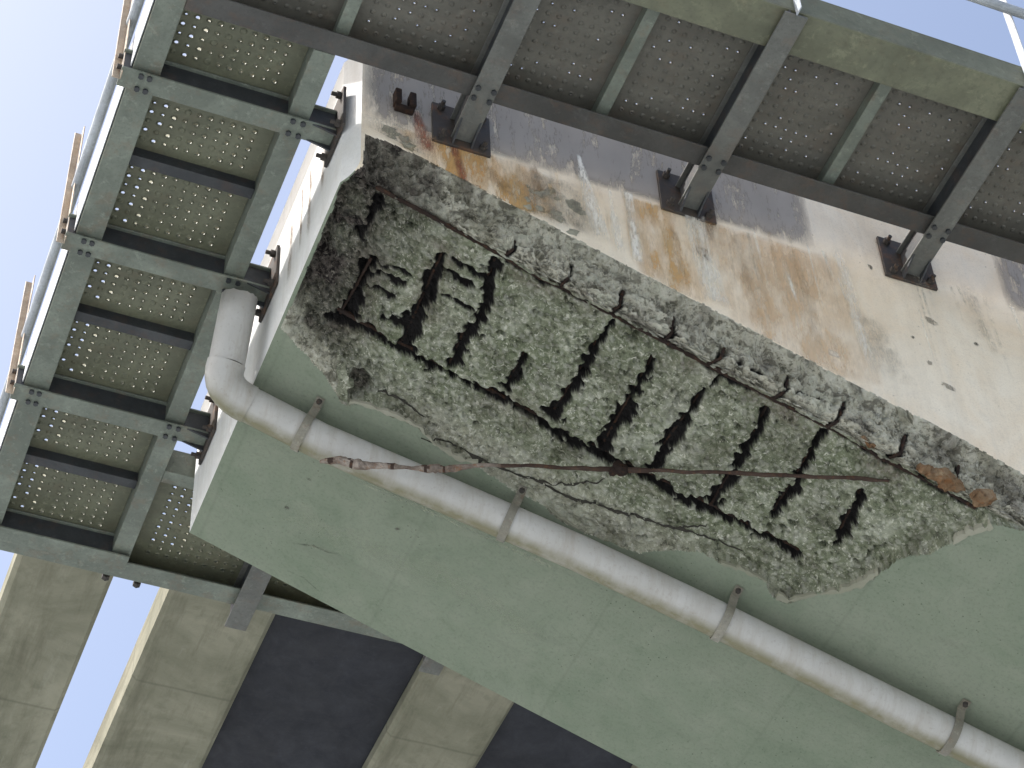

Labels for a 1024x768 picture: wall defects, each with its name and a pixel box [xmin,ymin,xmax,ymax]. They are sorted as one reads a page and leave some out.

spalling [281,125,1024,604]
rust [639,203,690,289]